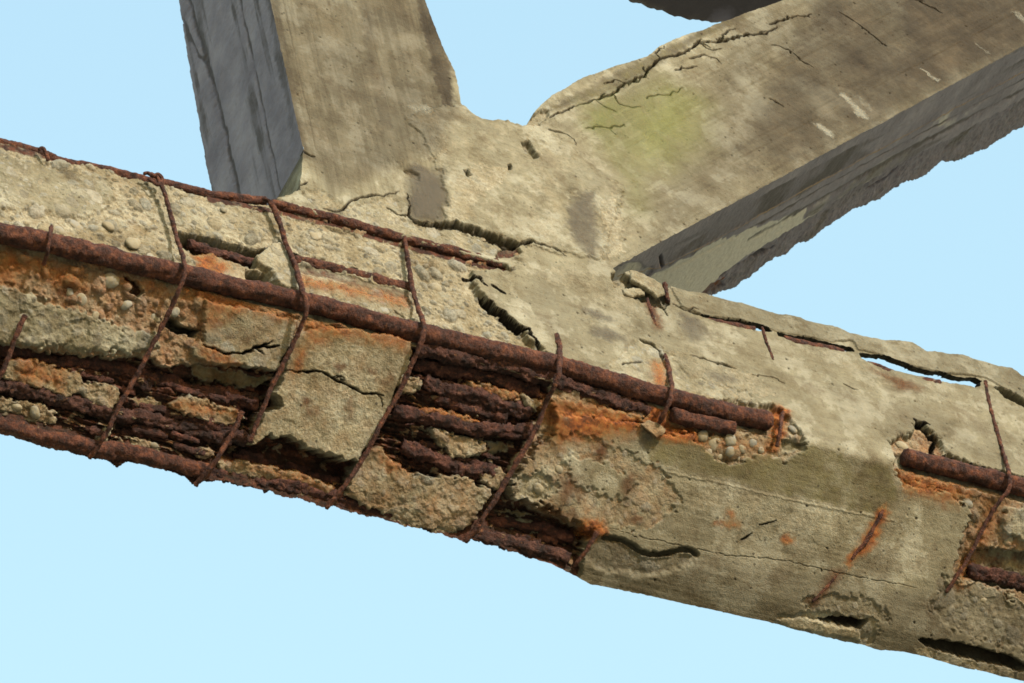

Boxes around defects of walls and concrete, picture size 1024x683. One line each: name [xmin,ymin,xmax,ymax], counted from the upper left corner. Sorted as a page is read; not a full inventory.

crack [569,16,811,142]
crack [344,192,425,227]
rust [196,255,226,273]
spalling [0,143,542,351]
rust [308,321,405,349]
crack [470,280,540,350]
spalling [611,276,1024,402]
crack [203,341,384,408]
spalling [0,244,807,576]
rust [420,407,480,422]
rust [540,403,703,461]
spalling [774,610,881,646]